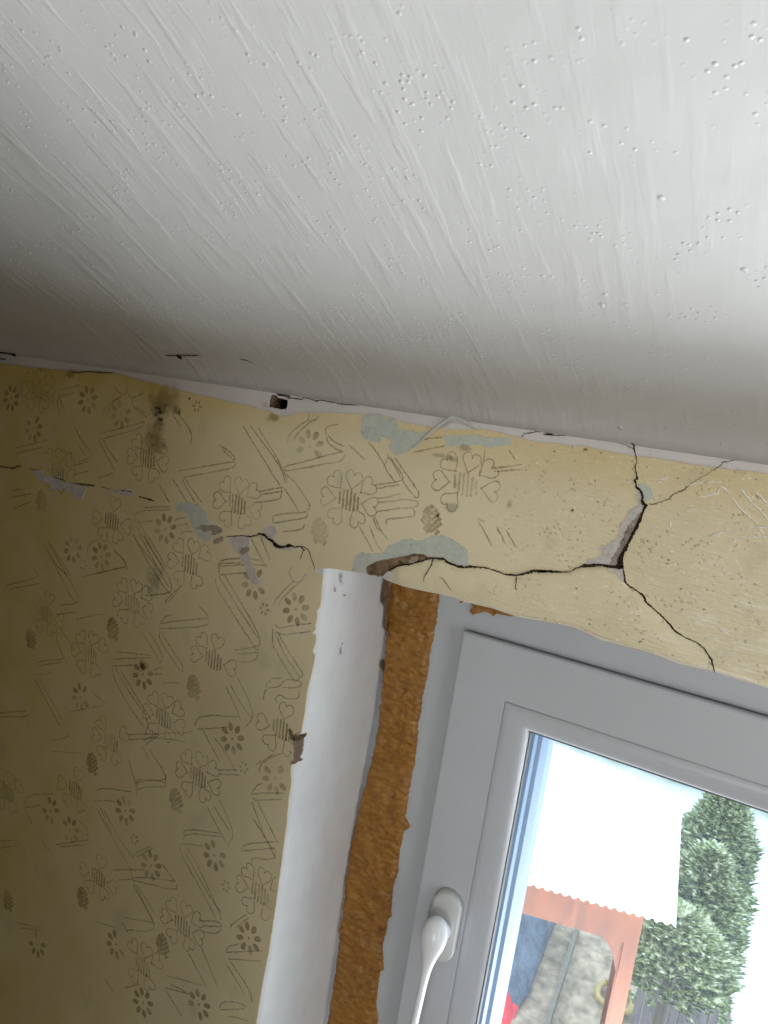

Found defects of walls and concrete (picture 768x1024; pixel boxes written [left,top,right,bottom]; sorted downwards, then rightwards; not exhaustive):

flaking render [266,392,292,413]
peeling [361,414,512,455]
crack [0,465,154,501]
flaking render [175,502,261,585]
crack [227,533,315,569]
crack [388,443,737,672]
flaking render [586,484,653,582]
flaking render [352,535,470,637]
flaking render [288,729,307,765]